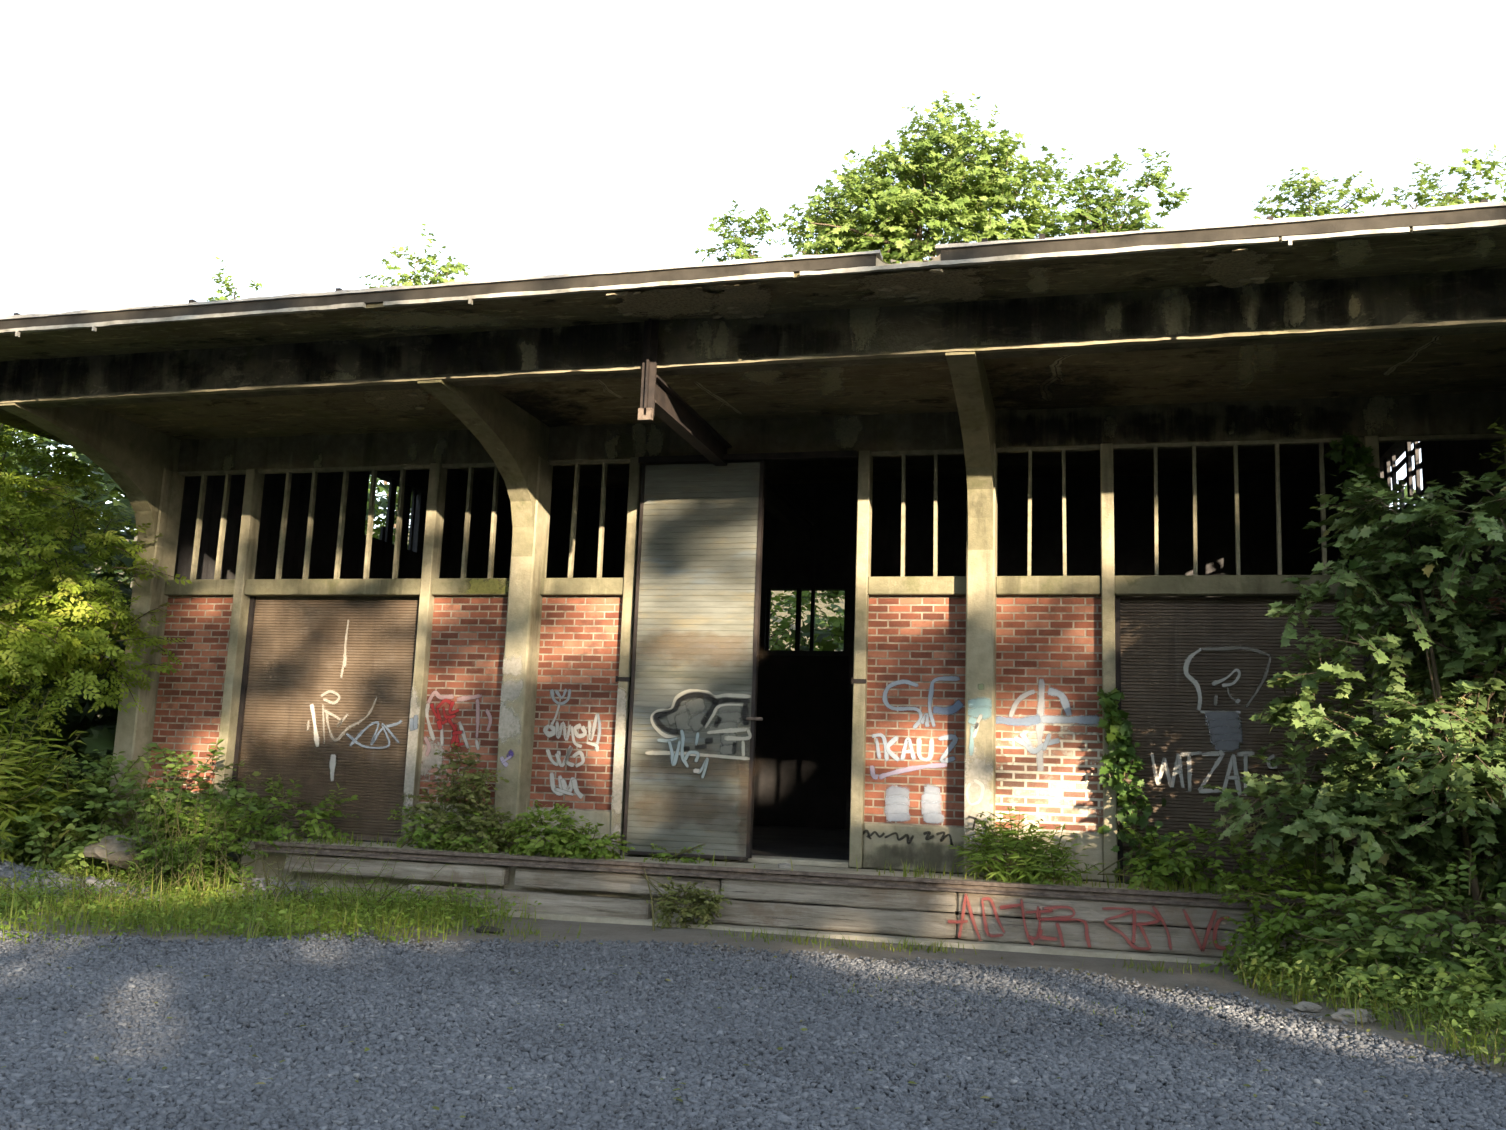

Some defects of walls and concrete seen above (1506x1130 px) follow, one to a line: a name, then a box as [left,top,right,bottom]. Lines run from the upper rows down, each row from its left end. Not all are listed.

spalling [606,282,772,320]
spalling [1196,248,1275,288]
leakage [1412,232,1506,320]
leakage [0,353,203,396]
leakage [332,310,663,427]
leakage [696,307,880,360]
leakage [955,239,1398,446]